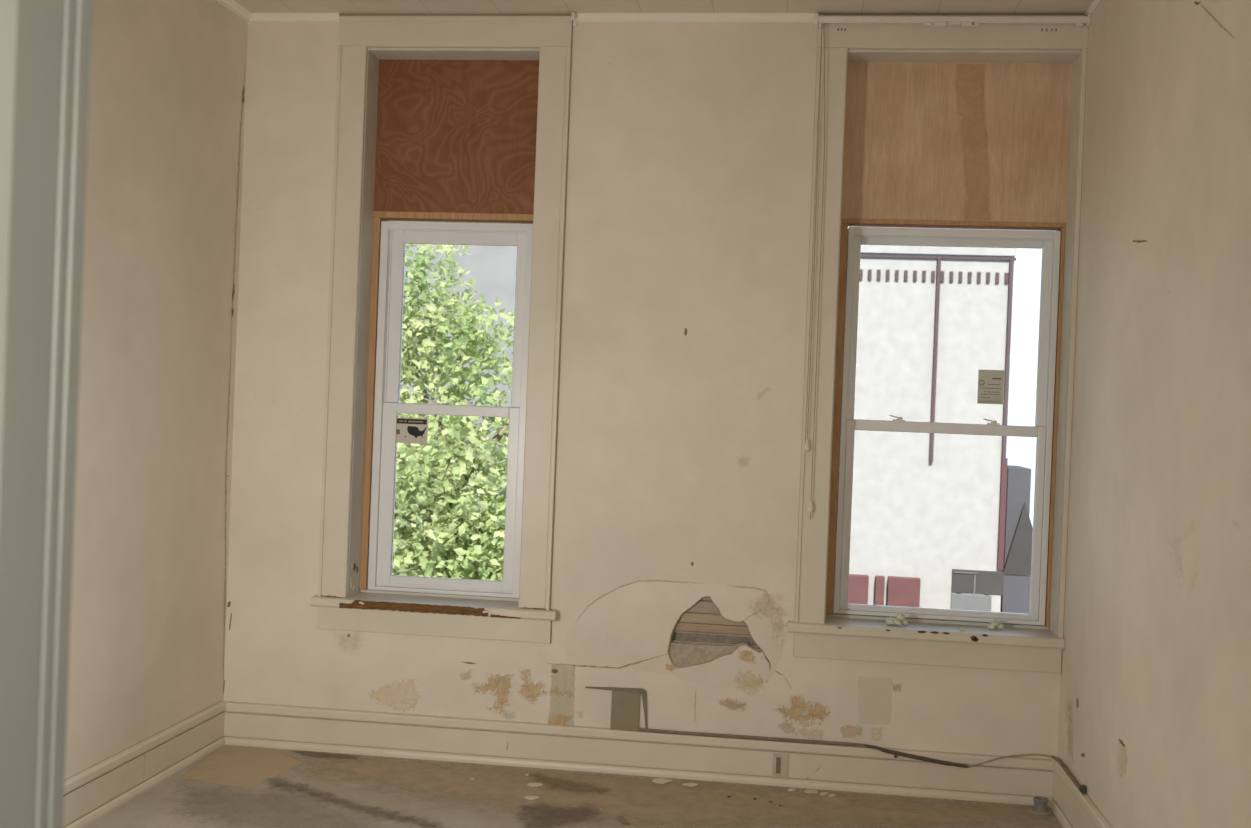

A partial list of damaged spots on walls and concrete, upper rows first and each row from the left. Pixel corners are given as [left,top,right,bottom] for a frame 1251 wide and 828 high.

peeling [339,561,521,619]
crack [577,580,782,621]
spalling [667,596,764,669]
peeling [472,669,544,712]
peeling [776,696,828,738]